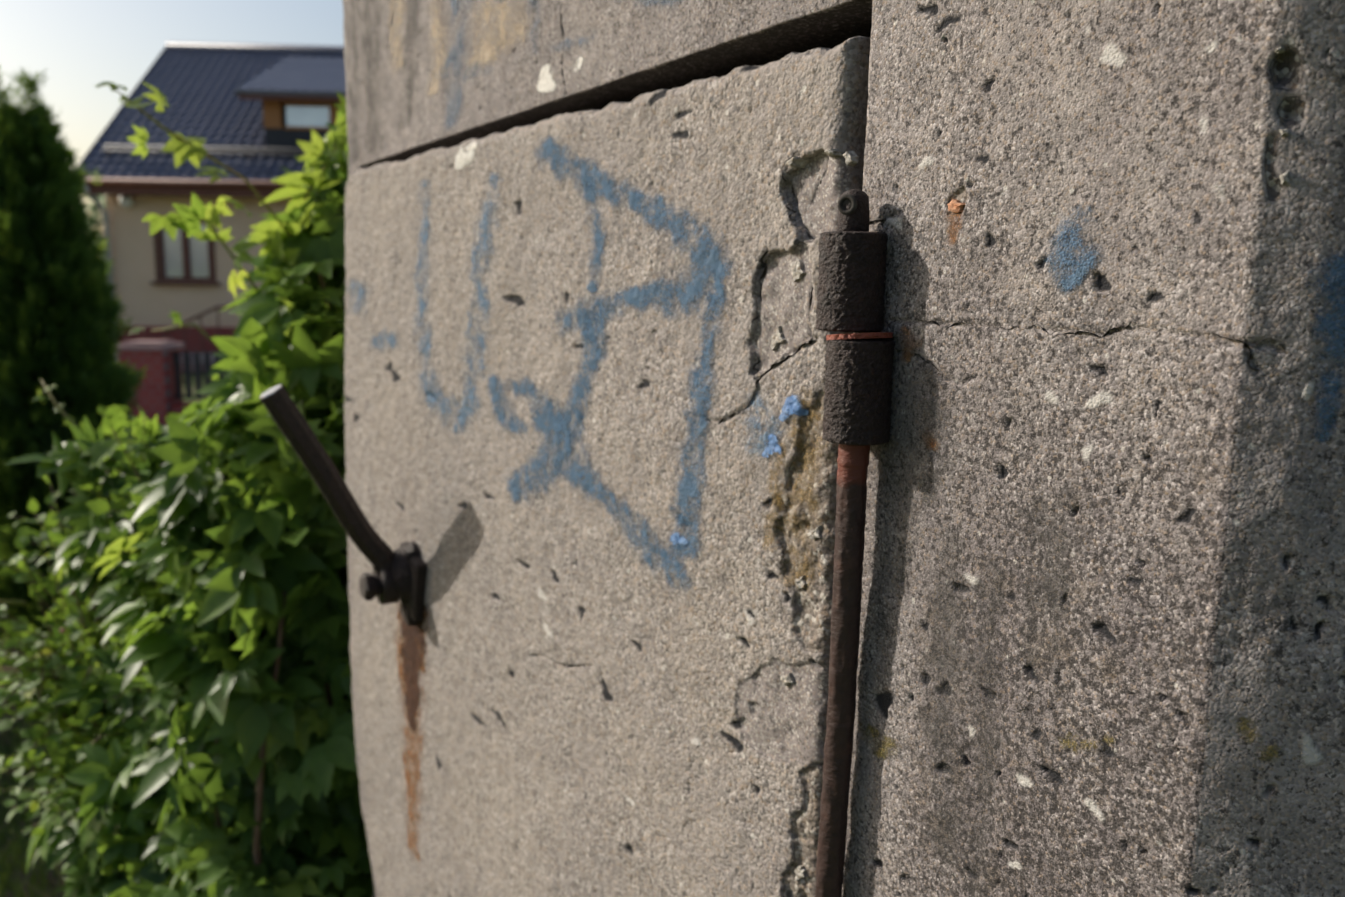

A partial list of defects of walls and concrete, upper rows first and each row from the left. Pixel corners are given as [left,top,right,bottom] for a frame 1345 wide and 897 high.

crack [782,151,829,239]
crack [751,251,768,324]
crack [704,286,816,424]
spalling [749,149,858,375]
crack [1001,322,1136,337]
crack [1214,333,1285,370]
corrosion [397,606,430,861]